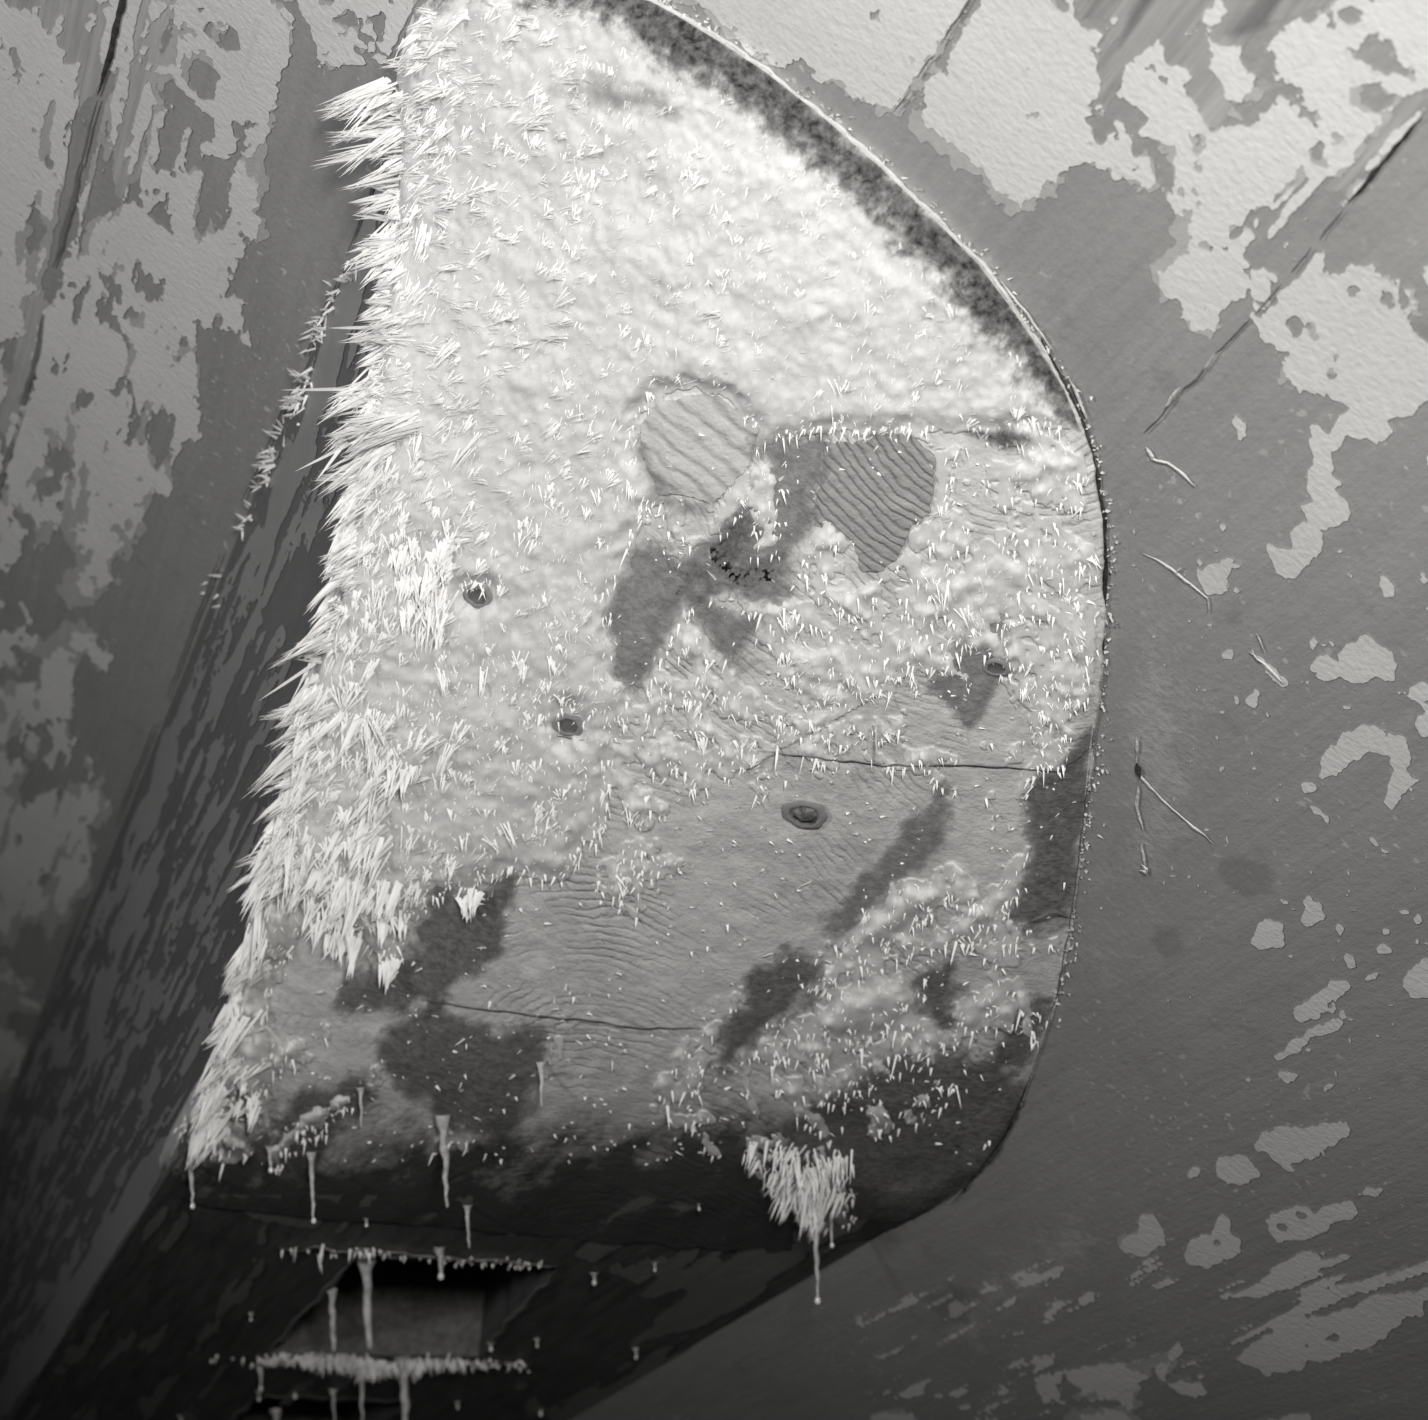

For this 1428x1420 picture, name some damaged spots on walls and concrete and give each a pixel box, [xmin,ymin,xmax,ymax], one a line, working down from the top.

peeling [671,0,1428,583]
crack [1145,318,1251,487]
peeling [1184,543,1241,604]
peeling [0,0,418,1420]
damp [1097,627,1214,884]
peeling [1251,895,1379,1084]
peeling [1376,888,1428,1038]
peeling [1187,1071,1371,1186]
peeling [515,1213,870,1420]
peeling [869,1334,1208,1420]
peeling [1184,1214,1241,1269]
peeling [1218,1187,1428,1377]